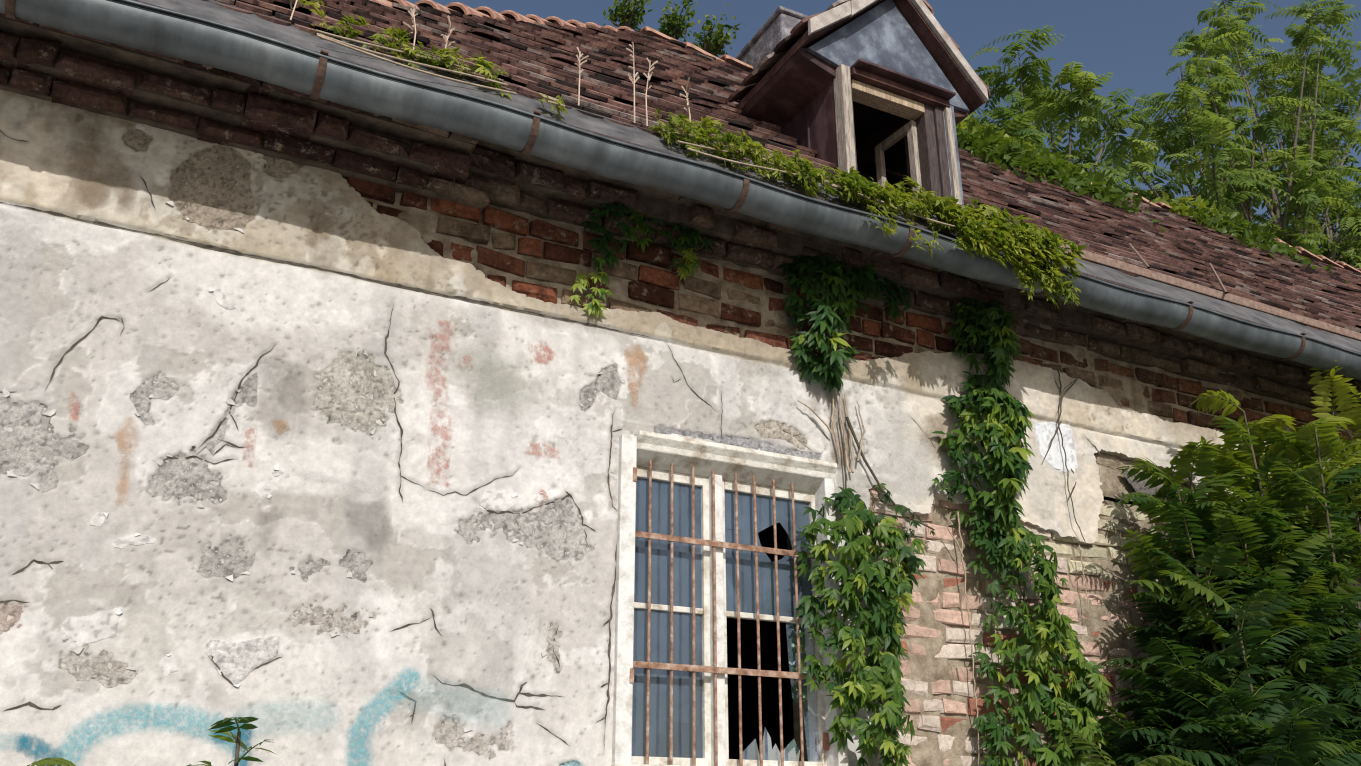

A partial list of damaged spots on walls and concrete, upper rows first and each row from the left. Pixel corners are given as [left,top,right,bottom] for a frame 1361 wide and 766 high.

flaking render [166,144,303,233]
spalling [309,350,403,435]
flaking render [579,364,625,411]
spalling [0,388,90,493]
spalling [147,373,258,508]
crack [0,174,723,746]
spalling [454,492,595,560]